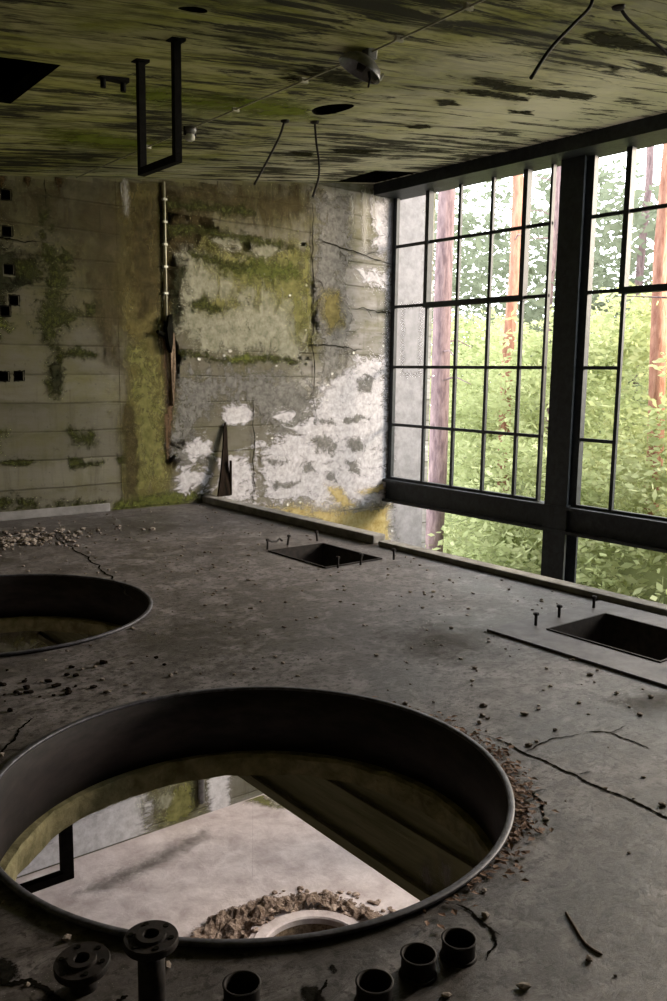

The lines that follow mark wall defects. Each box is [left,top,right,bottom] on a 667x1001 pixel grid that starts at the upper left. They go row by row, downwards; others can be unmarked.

leakage [269,64,373,91]
leakage [434,77,598,115]
leakage [561,31,667,78]
leakage [0,175,375,509]
peeling [173,195,434,547]
crack [479,726,667,818]
crack [0,978,66,1001]